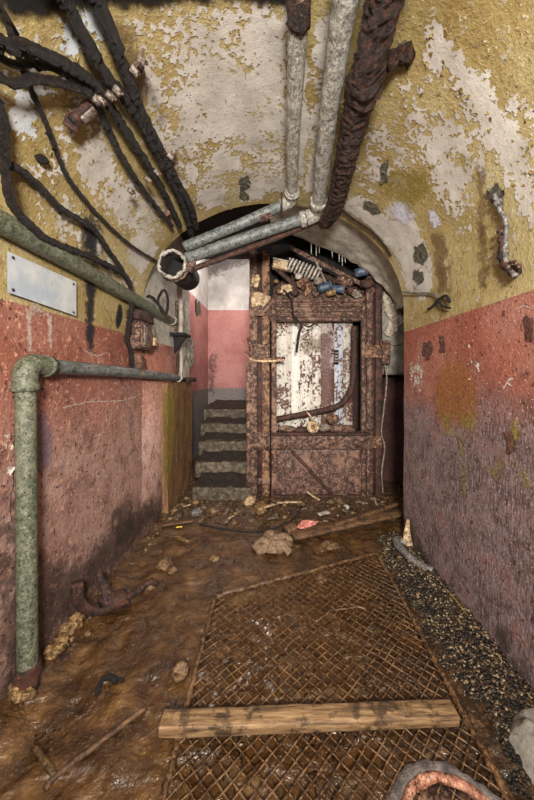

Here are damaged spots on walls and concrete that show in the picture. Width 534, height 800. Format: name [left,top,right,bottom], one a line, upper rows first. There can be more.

peeling [51,17,82,63]
peeling [79,4,104,49]
peeling [132,0,288,211]
peeling [0,77,165,288]
peeling [344,14,534,303]
corrosion [320,333,333,404]
peeling [410,335,446,392]
peeling [523,315,534,342]